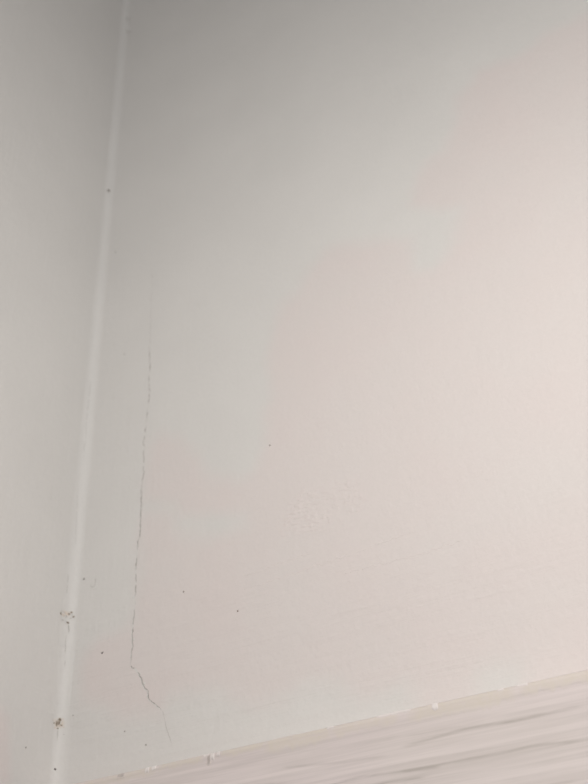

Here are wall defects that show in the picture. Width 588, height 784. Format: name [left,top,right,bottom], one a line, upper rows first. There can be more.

crack [130,273,172,744]